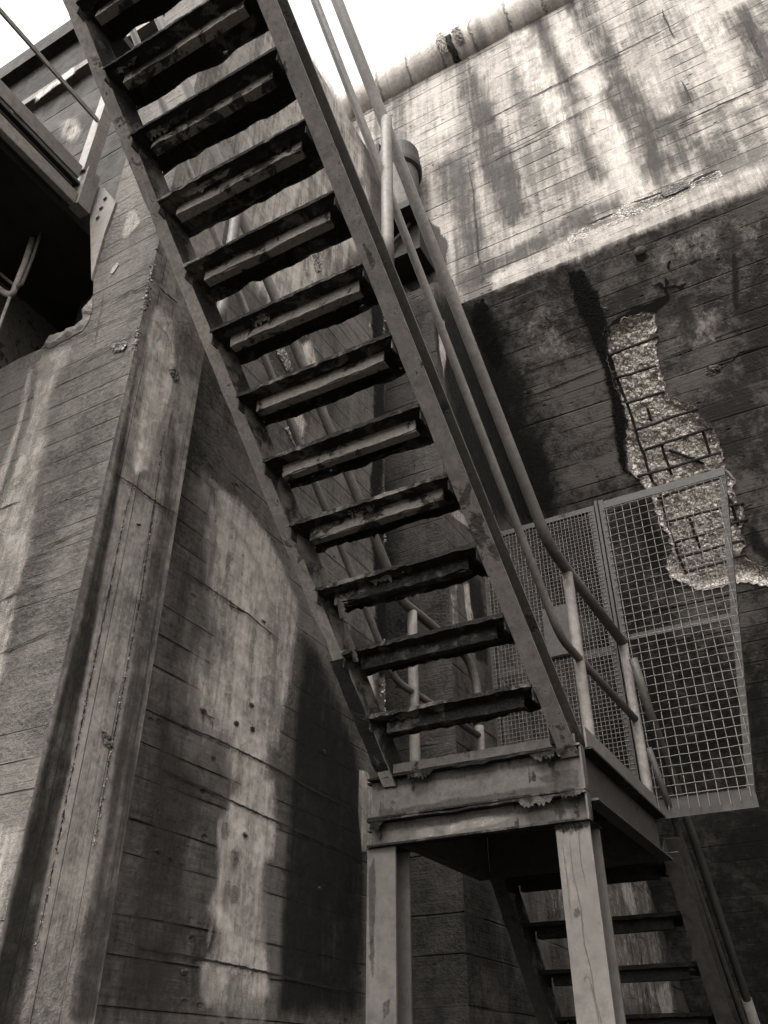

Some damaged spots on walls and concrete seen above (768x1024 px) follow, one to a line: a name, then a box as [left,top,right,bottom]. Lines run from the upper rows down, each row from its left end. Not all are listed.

spalling [435,26,465,64]
damp [460,54,527,225]
damp [509,1,693,201]
damp [681,2,768,104]
damp [705,167,764,201]
spalling [42,300,92,348]
damp [567,269,631,476]
spalling [604,311,768,590]